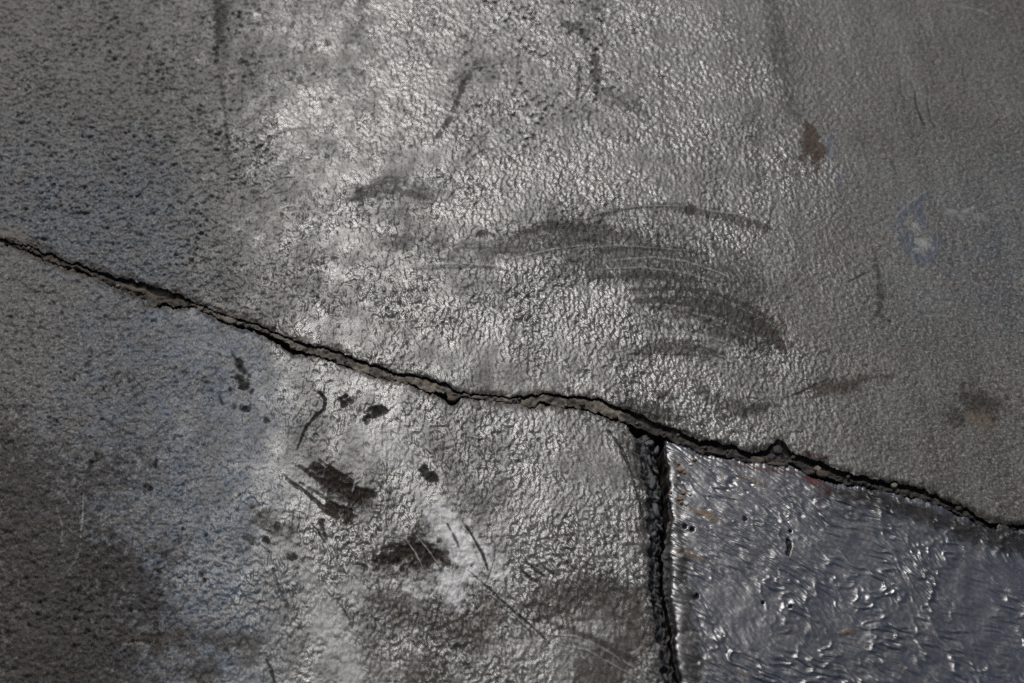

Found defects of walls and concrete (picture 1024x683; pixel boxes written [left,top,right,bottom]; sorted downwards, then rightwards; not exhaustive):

rust [797,121,834,174]
crack [0,237,1024,683]